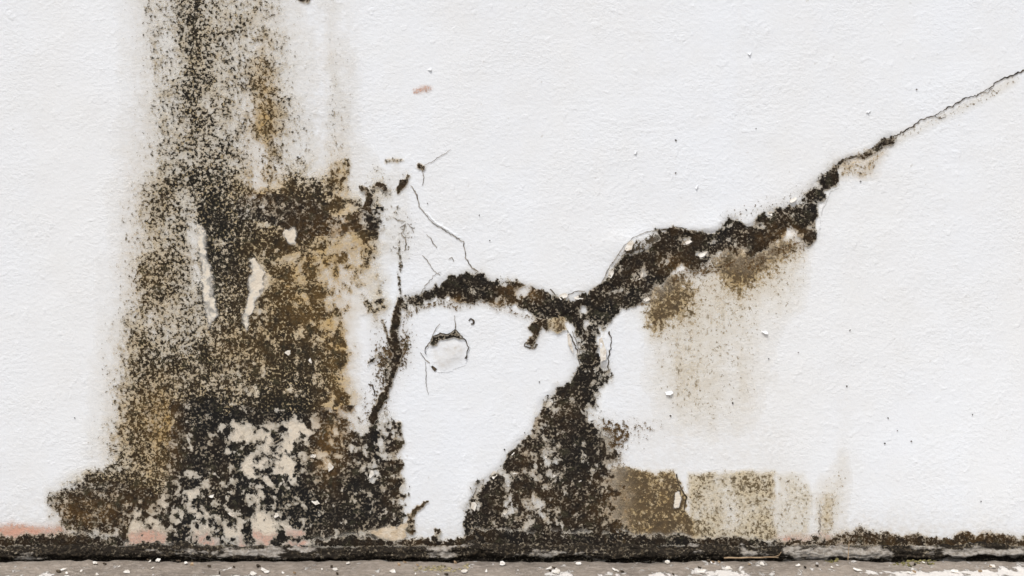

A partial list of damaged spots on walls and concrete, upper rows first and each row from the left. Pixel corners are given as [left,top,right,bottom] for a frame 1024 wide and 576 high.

leakage [0,0,475,548]
crack [361,70,1024,437]
leakage [643,238,805,425]
leakage [462,330,1024,548]